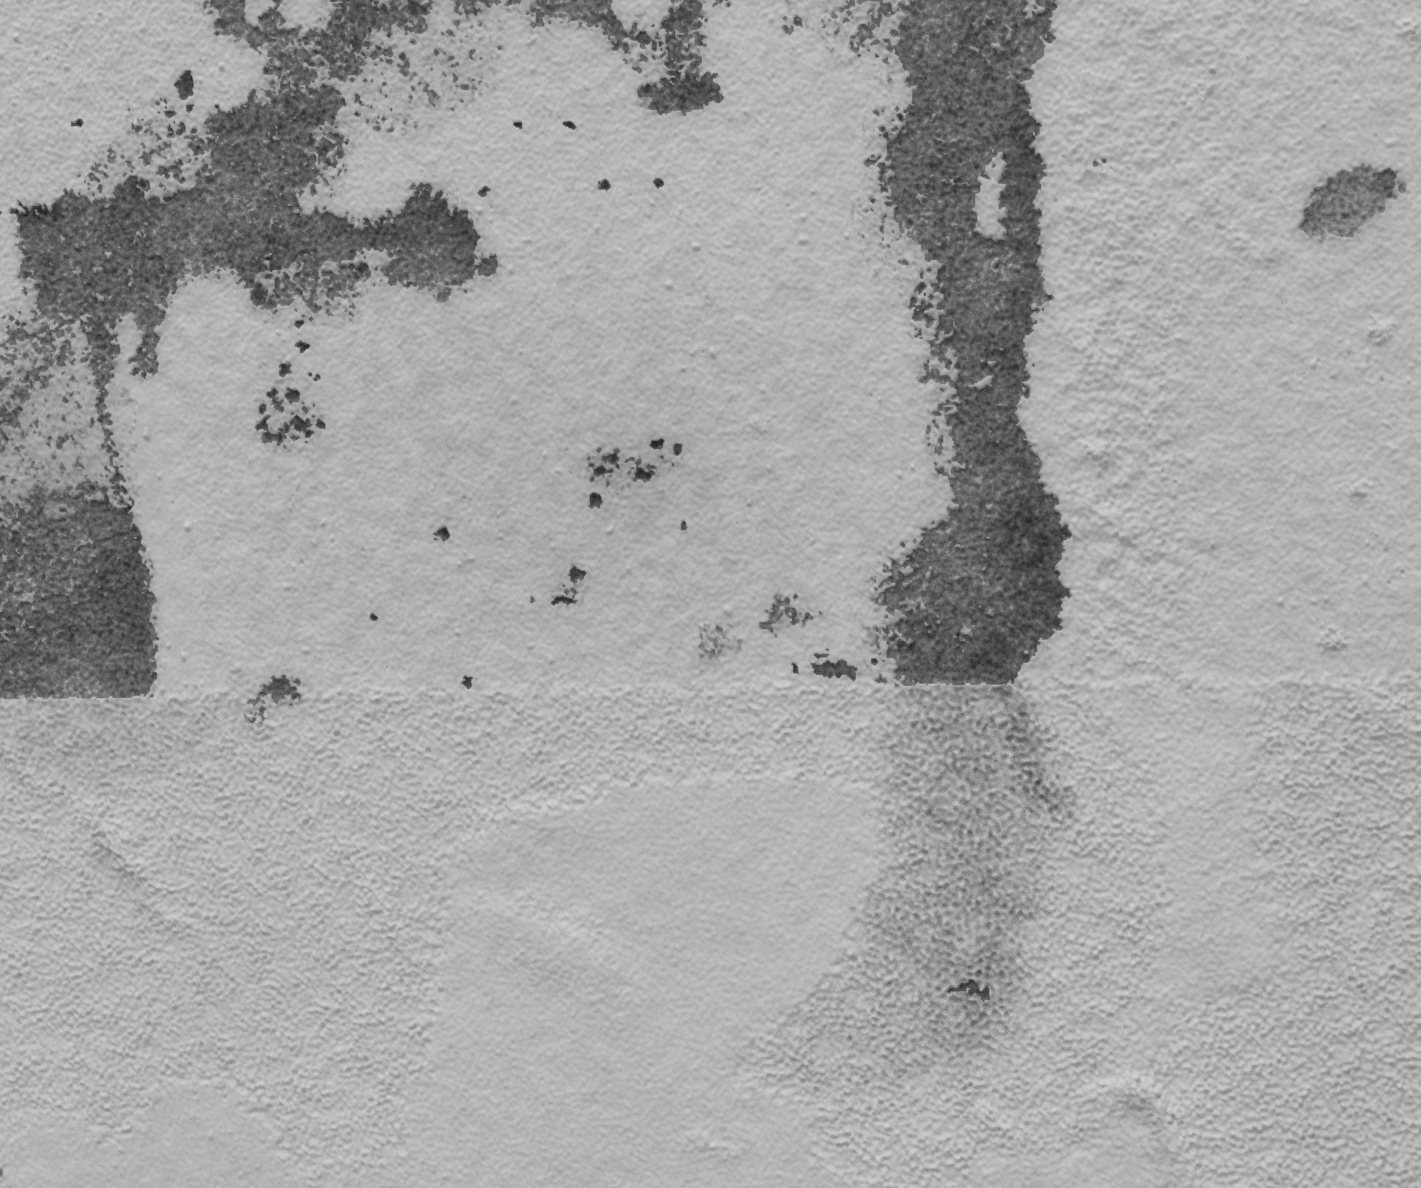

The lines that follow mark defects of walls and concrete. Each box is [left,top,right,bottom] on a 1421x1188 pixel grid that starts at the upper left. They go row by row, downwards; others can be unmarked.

peeling [781,15,803,35]
crack [0,200,65,231]
spalling [1298,164,1406,239]
peeling [0,0,730,699]
peeling [822,0,1072,686]
peeling [698,623,741,658]